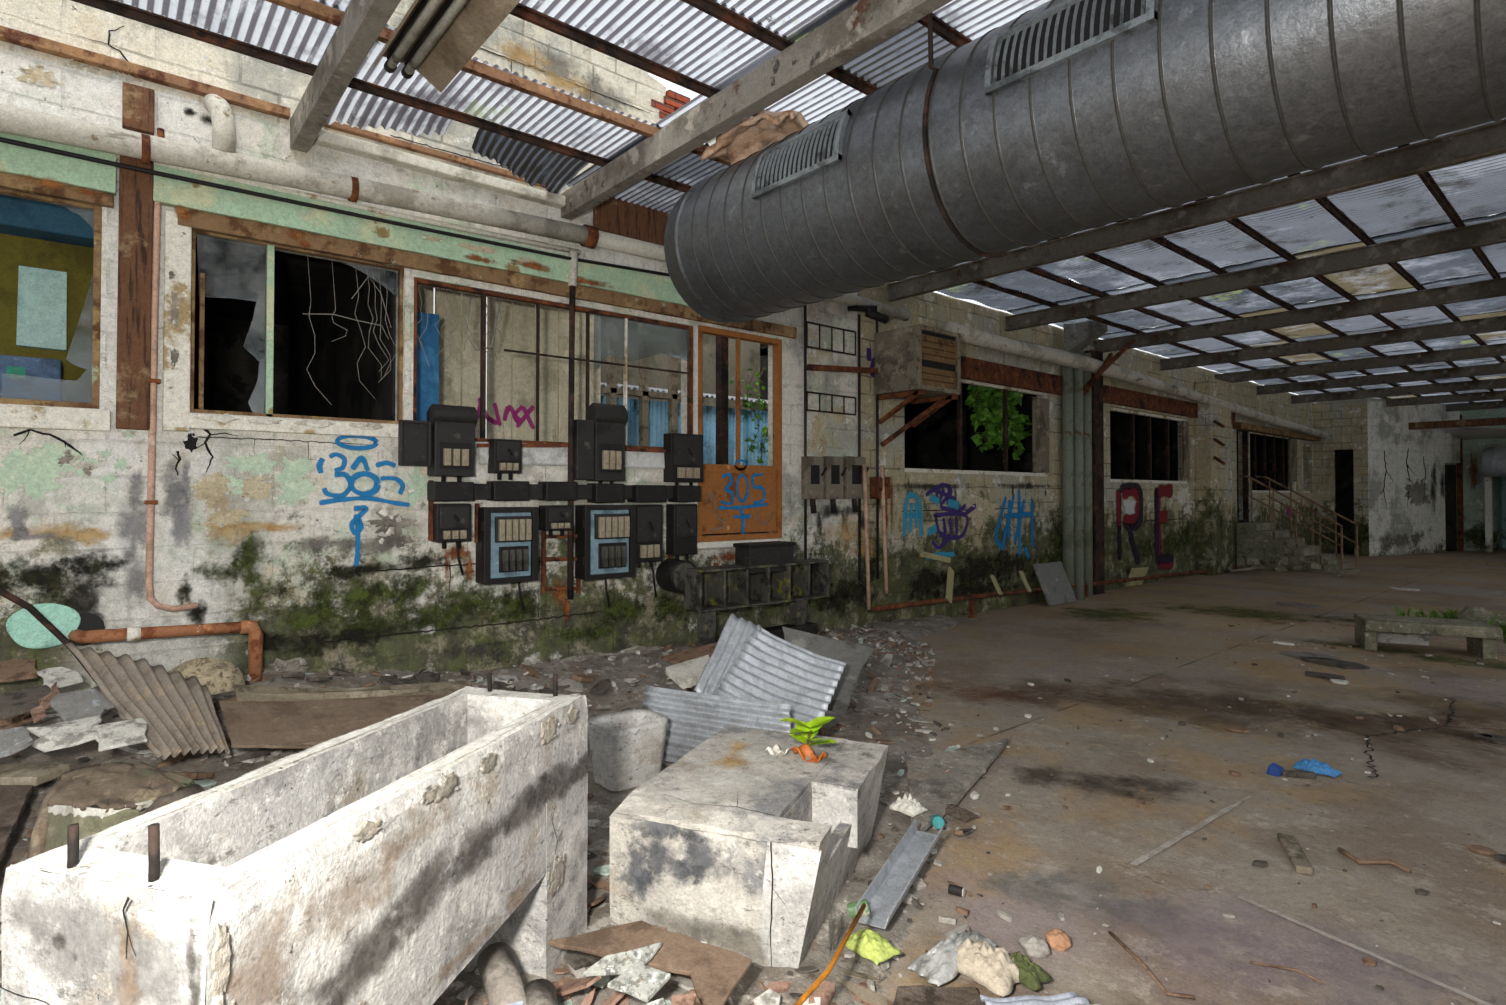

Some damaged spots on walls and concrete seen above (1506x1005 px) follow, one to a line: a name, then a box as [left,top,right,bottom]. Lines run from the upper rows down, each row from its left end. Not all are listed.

peeling [0,443,131,501]
peeling [1404,478,1431,507]
leakage [301,537,447,580]
leakage [177,574,207,624]
leakage [410,594,434,633]
leakage [247,623,390,657]
leakage [653,744,775,807]
leakage [309,751,593,1005]
leakage [617,821,718,897]
leakage [654,913,763,958]
crack [0,986,49,1005]